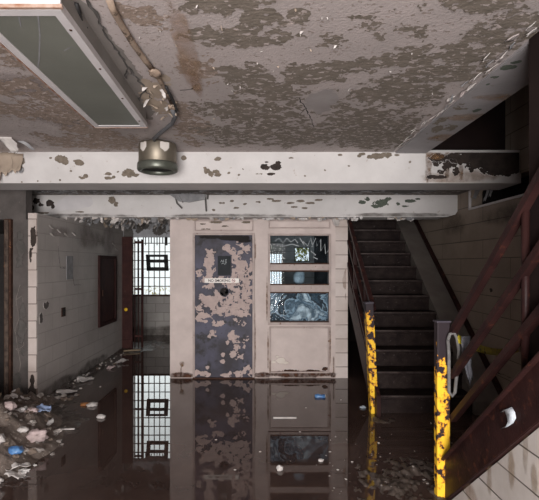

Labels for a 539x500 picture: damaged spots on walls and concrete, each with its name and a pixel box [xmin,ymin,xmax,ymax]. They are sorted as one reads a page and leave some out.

crack [86,0,152,101]
peeling [73,0,539,160]
peeling [0,47,151,151]
peeling [0,137,34,177]
spalling [256,161,282,176]
peeling [426,152,520,179]
peeling [32,190,247,214]
peeling [251,190,435,209]
peeling [74,211,179,237]
peeling [291,217,363,226]
peeling [186,209,284,364]
peeling [220,365,252,377]